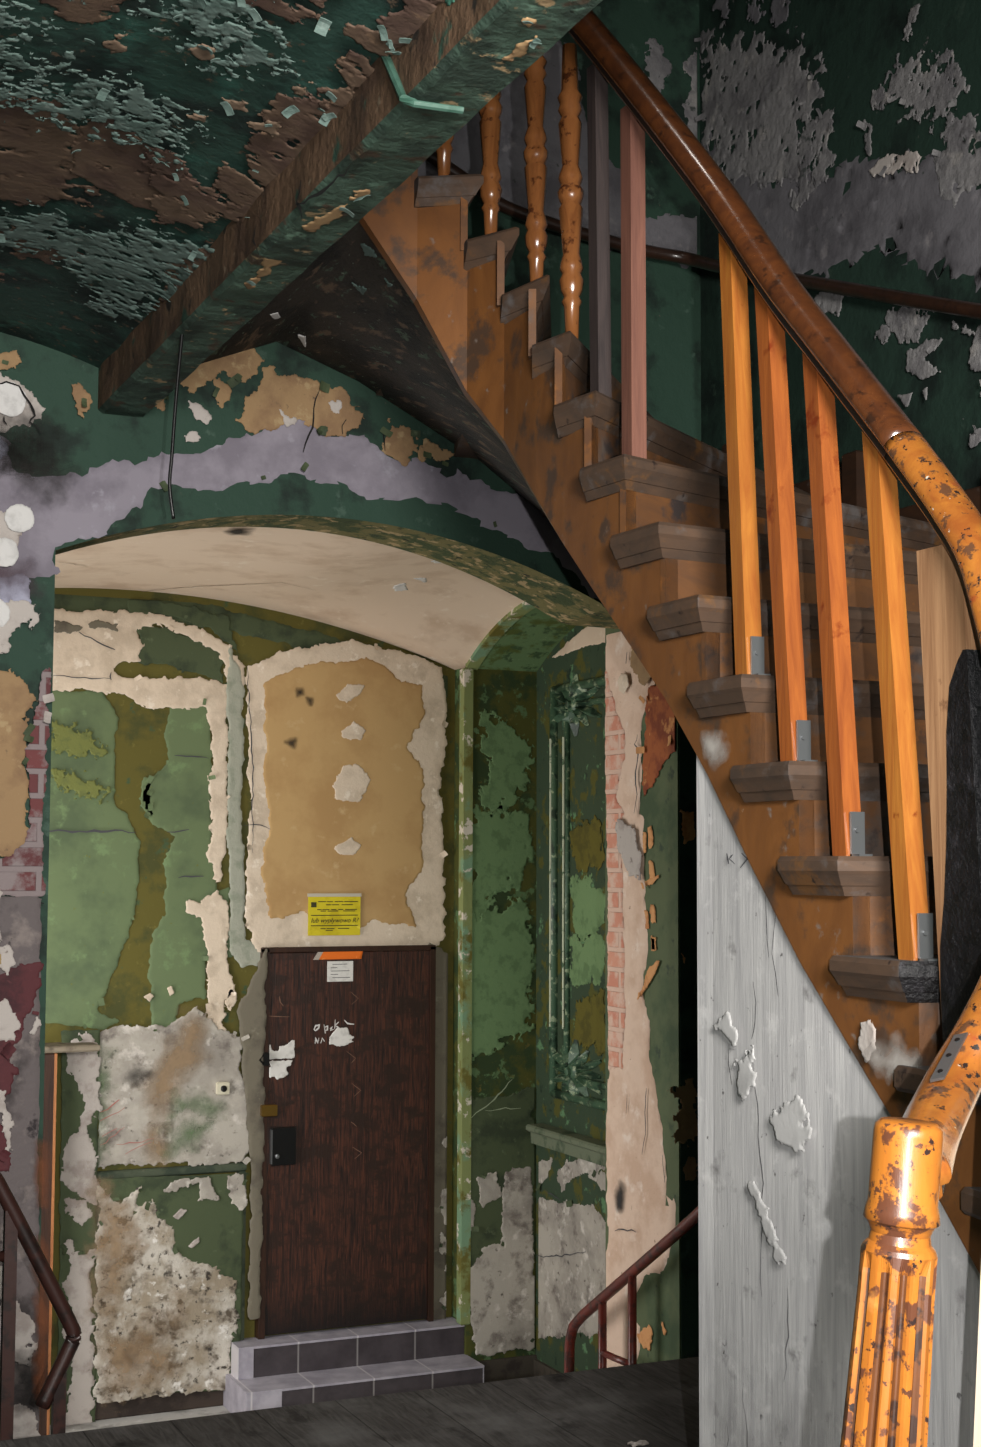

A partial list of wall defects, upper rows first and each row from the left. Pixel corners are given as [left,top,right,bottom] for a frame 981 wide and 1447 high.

peeling [0,0,455,329]
peeling [643,0,981,317]
peeling [0,350,22,370]
peeling [72,383,93,418]
peeling [180,348,364,442]
peeling [380,418,454,467]
peeling [874,306,981,407]
peeling [54,619,118,634]
peeling [127,599,239,684]
flaking render [470,632,698,1368]
peeling [0,667,268,1439]
flaking render [428,943,448,1320]